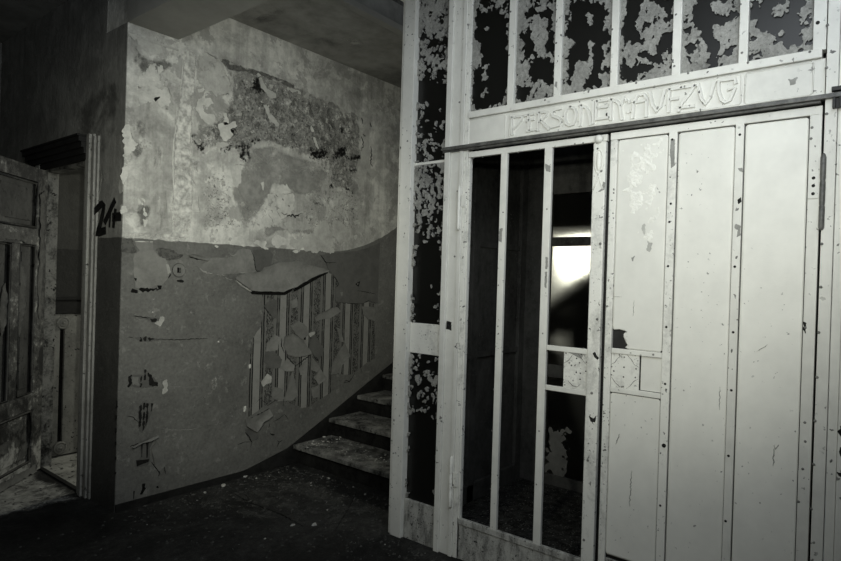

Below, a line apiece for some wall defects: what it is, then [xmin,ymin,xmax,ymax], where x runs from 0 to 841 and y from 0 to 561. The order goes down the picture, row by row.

peeling [417,0,449,84]
peeling [471,0,740,111]
peeling [749,0,814,62]
peeling [196,54,237,148]
peeling [257,73,279,127]
peeling [412,101,446,266]
peeling [261,328,351,401]
peeling [407,354,439,424]